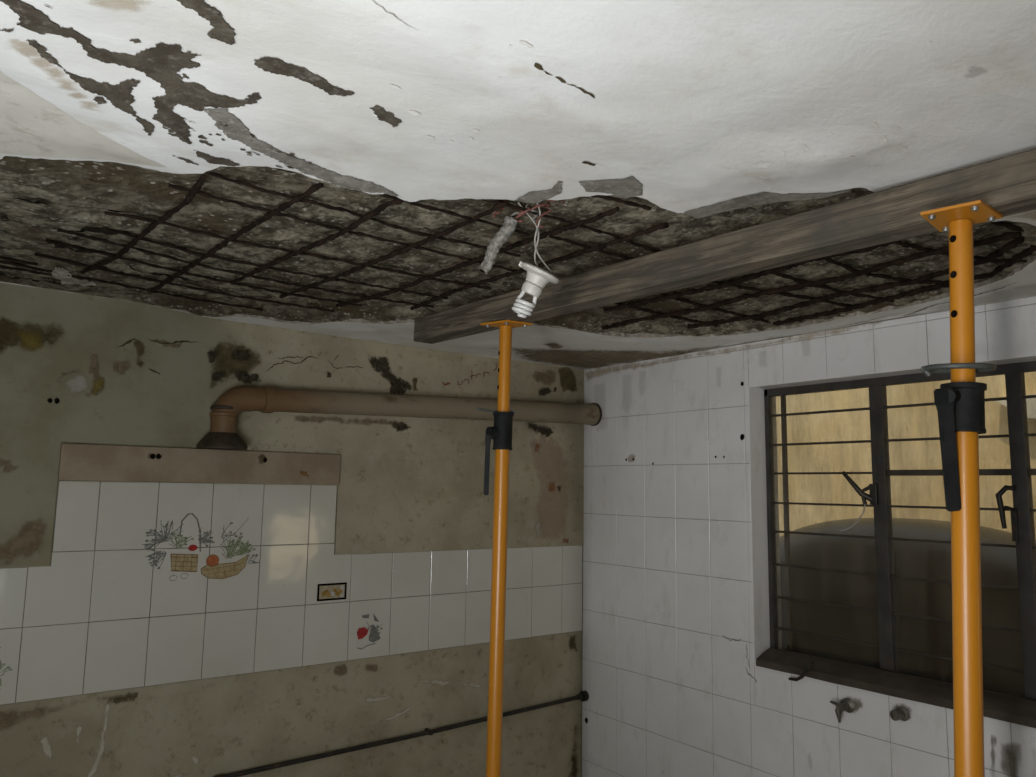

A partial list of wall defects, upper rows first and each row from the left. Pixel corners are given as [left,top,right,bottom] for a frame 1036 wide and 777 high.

crack [534,63,594,98]
spalling [0,0,875,323]
spalling [529,231,949,336]
spalling [973,221,1036,284]
peeling [207,344,261,387]
damp [991,739,1018,777]